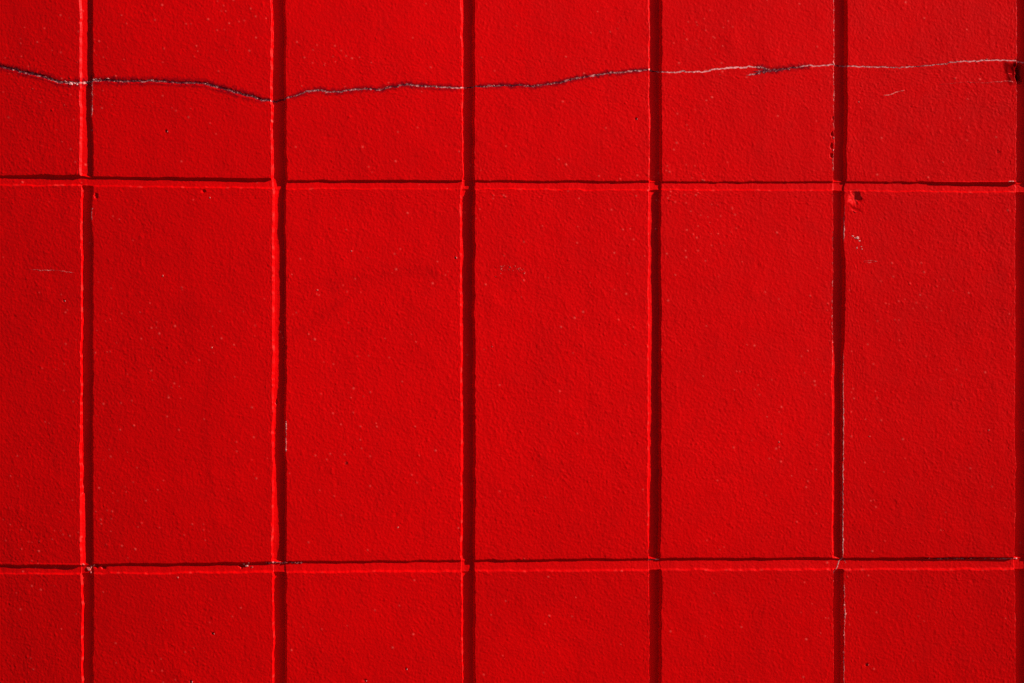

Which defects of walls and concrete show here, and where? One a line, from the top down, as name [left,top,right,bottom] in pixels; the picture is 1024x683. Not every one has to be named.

crack [0,59,1024,112]